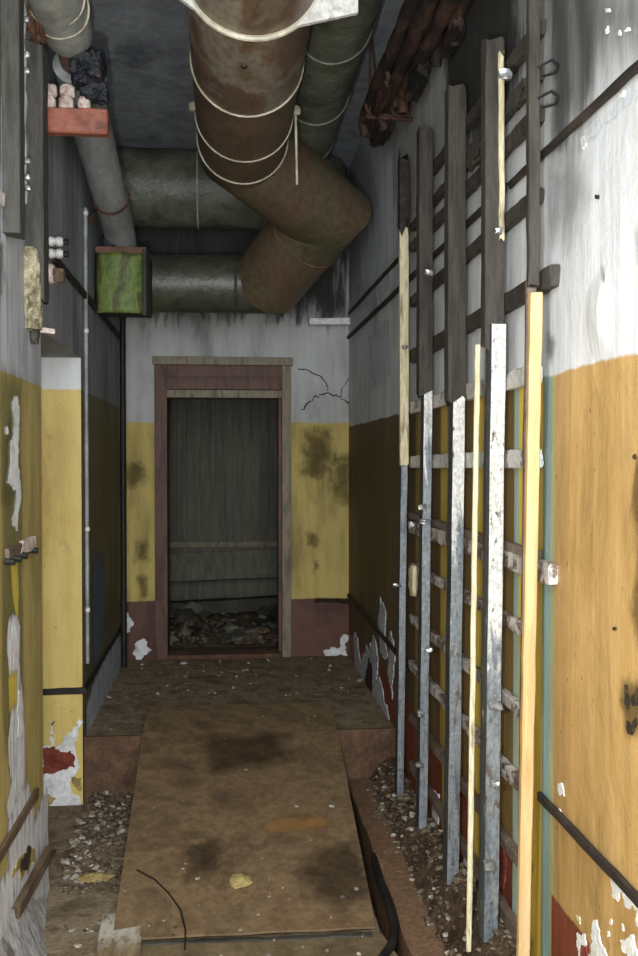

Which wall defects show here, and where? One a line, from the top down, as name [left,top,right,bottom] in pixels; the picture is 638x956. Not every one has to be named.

crack [298,368,349,410]
peeling [4,396,21,531]
peeling [7,562,25,819]
peeling [133,638,152,660]
peeling [323,597,396,720]
peeling [43,719,83,806]
flaking render [11,845,36,881]
peeling [576,879,638,956]